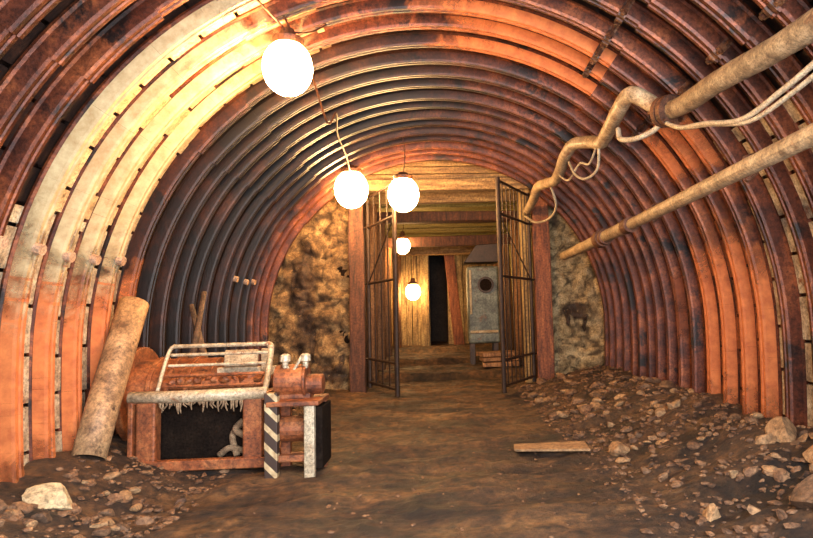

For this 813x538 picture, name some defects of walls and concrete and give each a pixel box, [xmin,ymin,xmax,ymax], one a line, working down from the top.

corrosion [434,0,617,96]
corrosion [642,118,719,181]
corrosion [0,265,137,482]
corrosion [689,222,779,418]